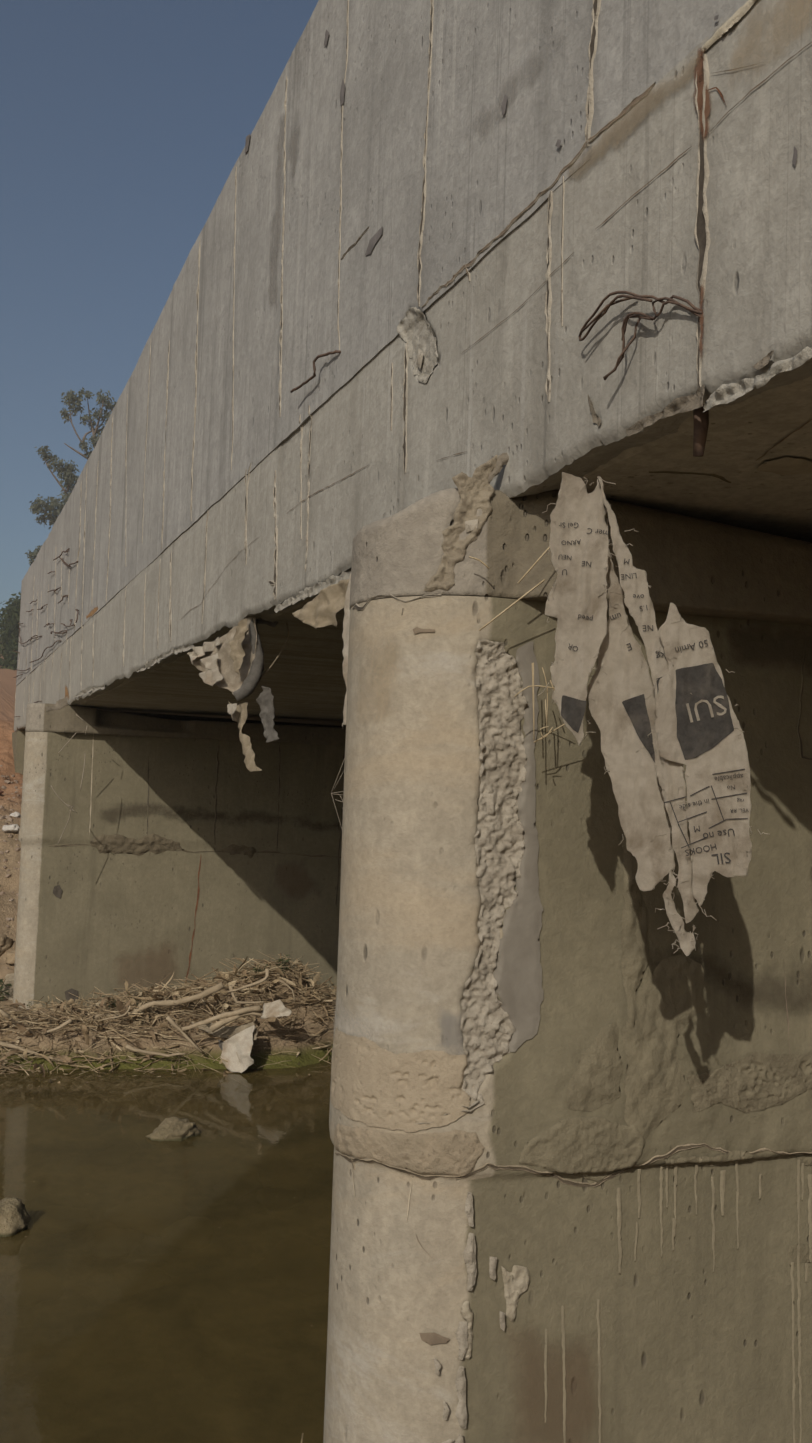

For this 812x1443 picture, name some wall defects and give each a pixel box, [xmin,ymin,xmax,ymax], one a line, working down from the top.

crack [337,0,369,350]
crack [417,0,812,402]
corrosion [694,49,710,139]
crack [15,76,368,718]
spalling [274,571,351,613]
crack [390,341,467,473]
spalling [423,453,509,592]
peeling [416,639,544,1124]
peeling [419,1191,530,1443]
damp [544,1306,566,1443]
damp [659,1150,762,1272]
damp [787,1155,812,1443]